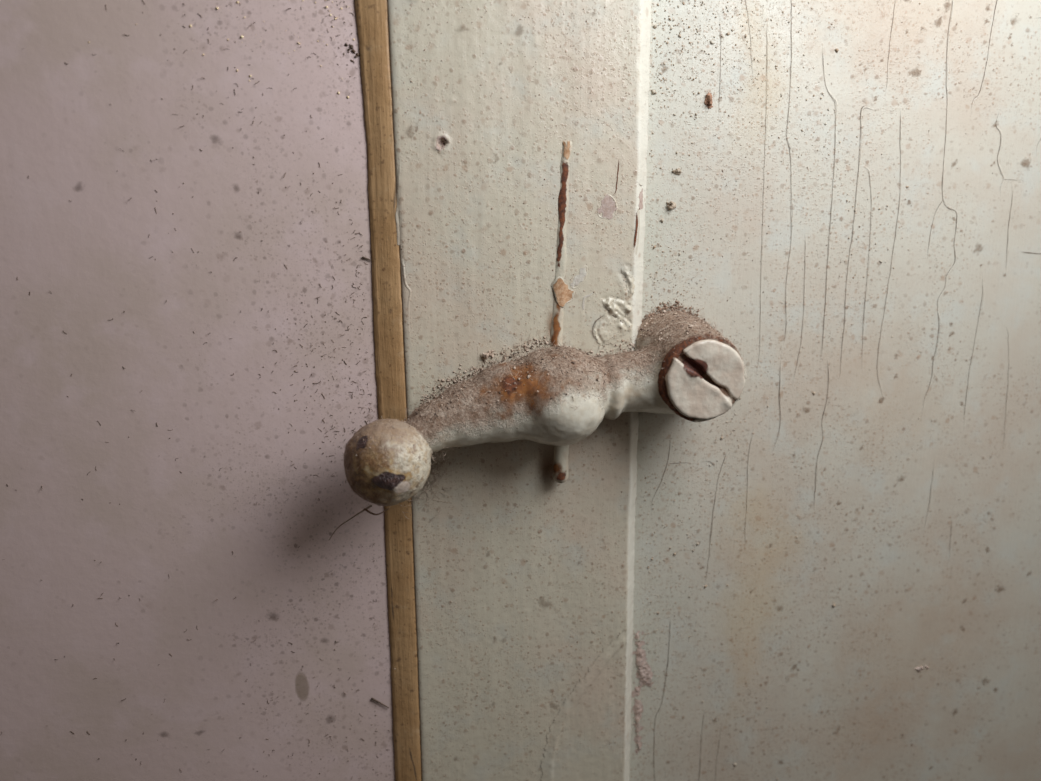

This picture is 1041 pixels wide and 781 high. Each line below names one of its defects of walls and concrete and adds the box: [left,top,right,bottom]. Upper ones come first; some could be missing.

corrosion [550,303,561,346]
corrosion [557,141,570,267]
crack [705,0,902,585]
crack [921,0,1014,430]